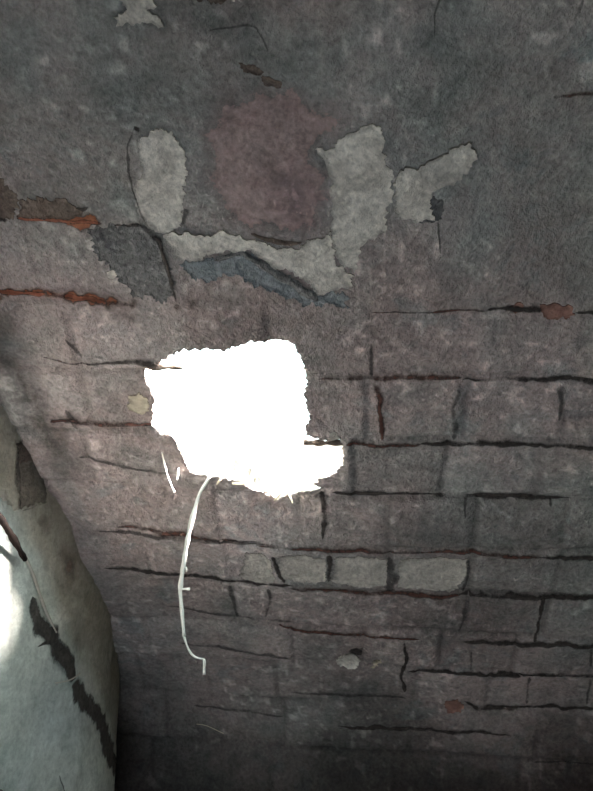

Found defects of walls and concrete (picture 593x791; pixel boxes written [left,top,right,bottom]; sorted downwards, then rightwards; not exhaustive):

peeling [114,0,164,28]
leakage [209,95,332,246]
spalling [0,178,88,223]
rust [17,214,101,232]
peeling [87,123,478,309]
rust [0,289,135,308]